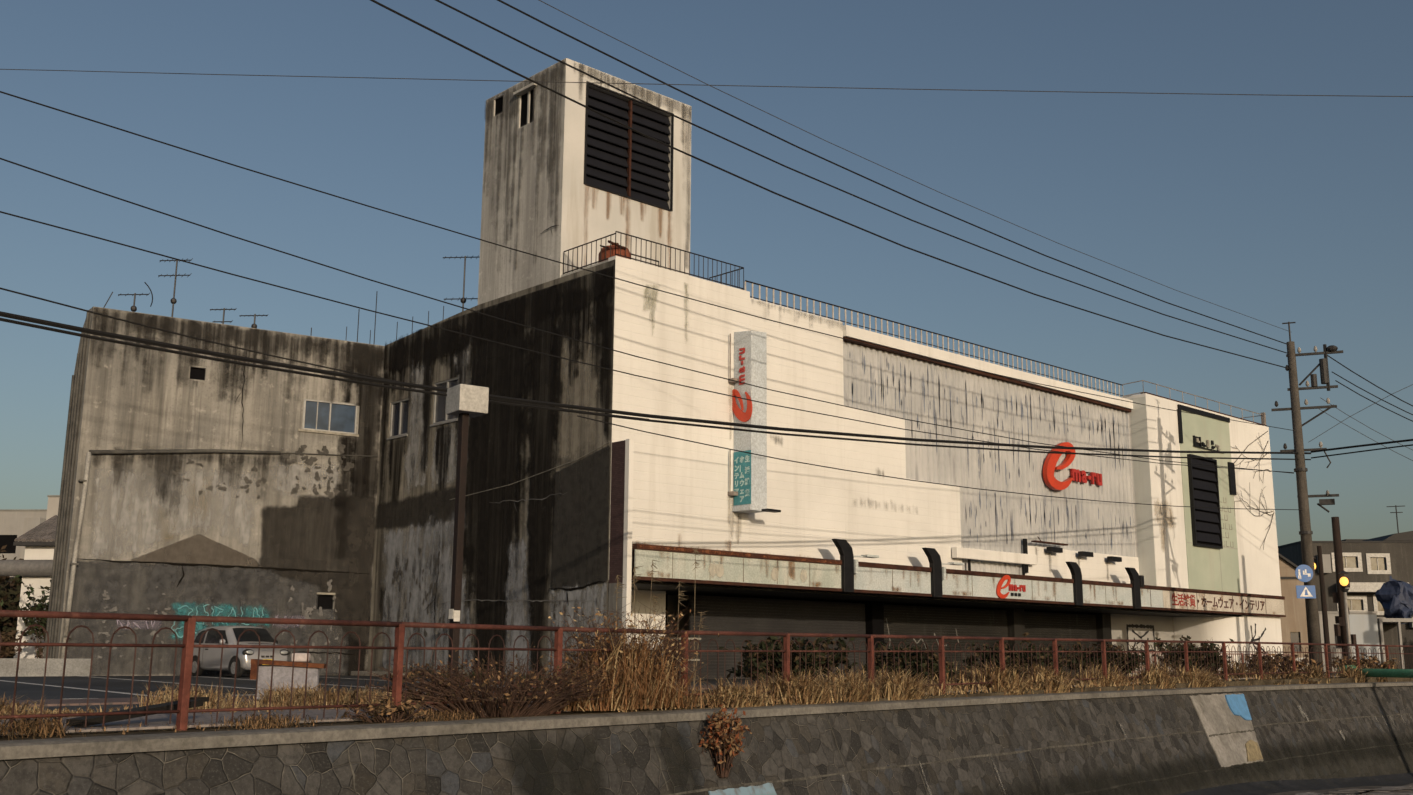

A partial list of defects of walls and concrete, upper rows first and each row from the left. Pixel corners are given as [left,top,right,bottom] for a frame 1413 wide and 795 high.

water stain [485,60,692,268]
water stain [66,266,614,679]
peeling [382,521,473,671]
peeling [506,539,530,679]
peeling [548,583,607,681]